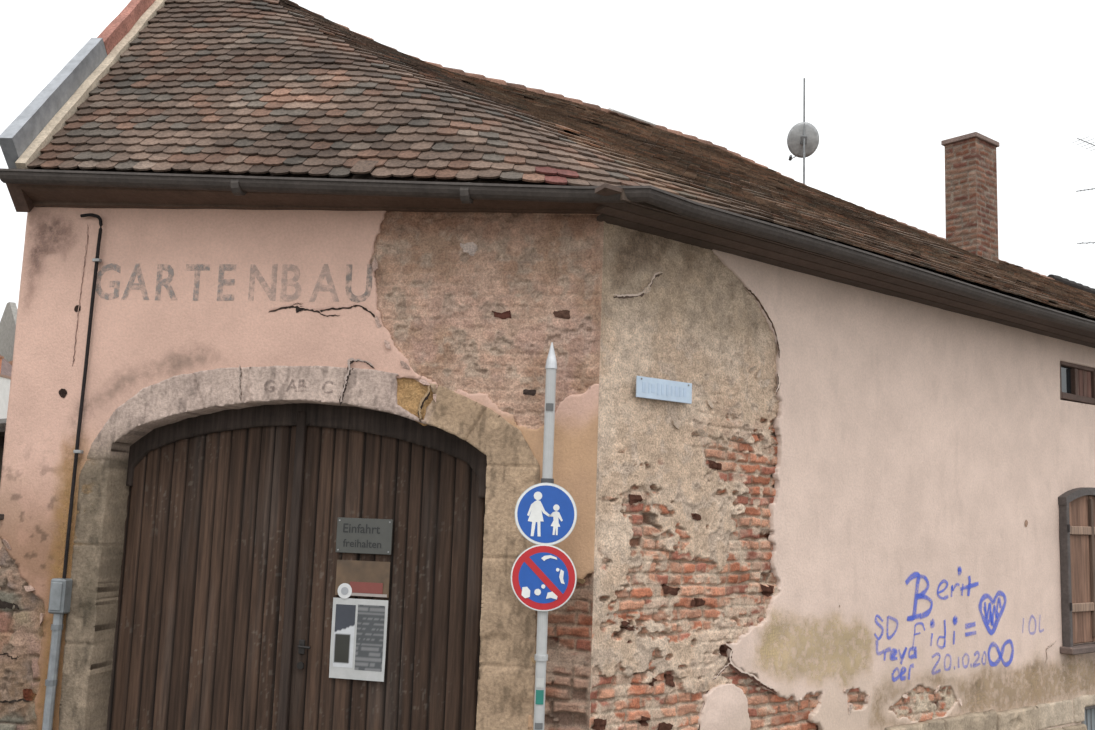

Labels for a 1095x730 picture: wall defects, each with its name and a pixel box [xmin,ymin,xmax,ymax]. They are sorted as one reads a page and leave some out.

crack [614,272,663,299]
crack [269,302,376,317]
flaking render [370,211,820,730]
flaking render [0,539,45,730]
water stain [760,616,871,682]
flaking render [843,688,870,715]
flaking render [888,685,962,722]